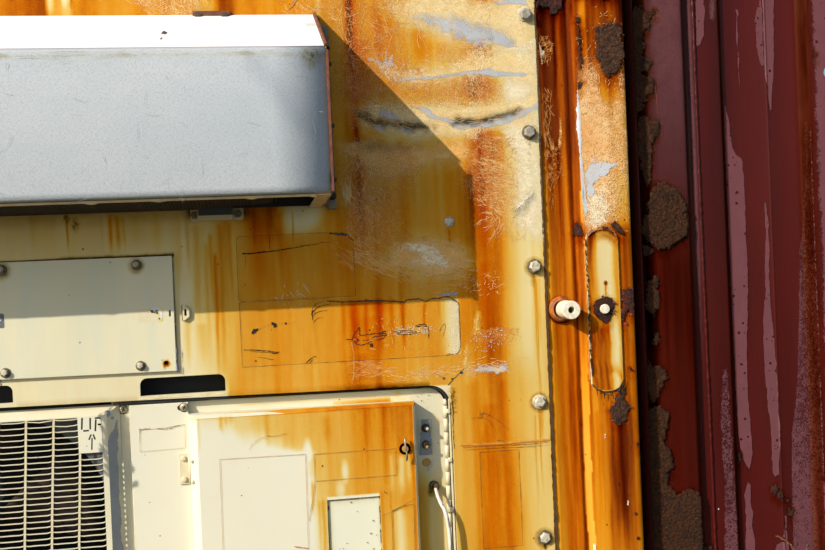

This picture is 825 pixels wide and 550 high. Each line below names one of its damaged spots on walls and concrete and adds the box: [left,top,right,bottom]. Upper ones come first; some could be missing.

rust [0,0,47,16]
rust [74,0,96,16]
rust [215,0,256,15]
rust [345,0,365,90]
peeling [367,53,396,73]
rust [535,0,714,550]
rust [344,271,383,390]
rust [458,133,516,550]
rust [325,401,415,453]
peeling [106,410,124,550]